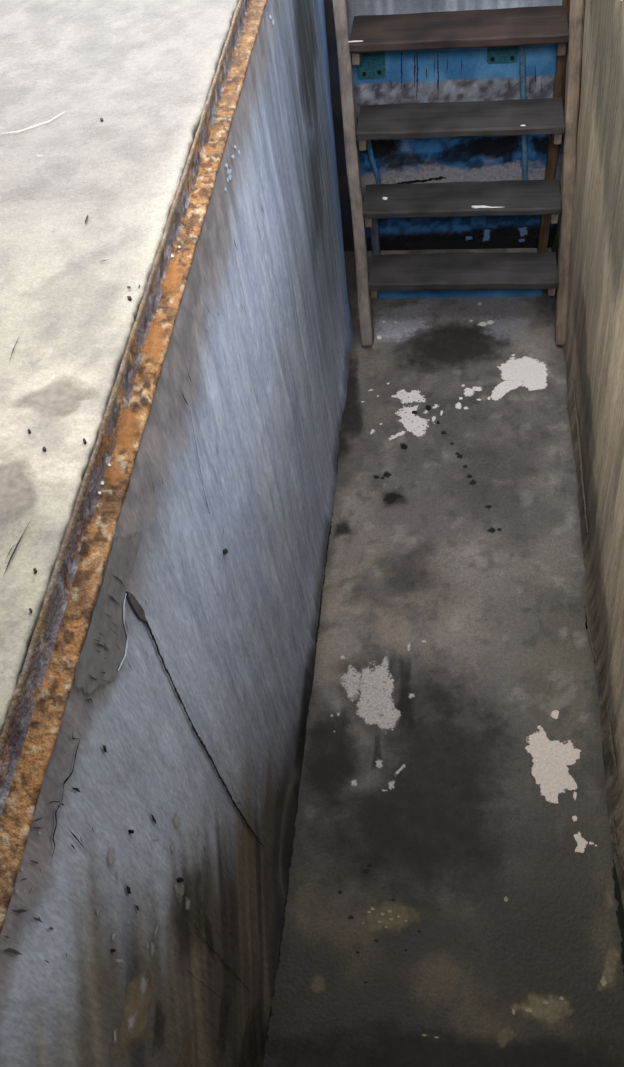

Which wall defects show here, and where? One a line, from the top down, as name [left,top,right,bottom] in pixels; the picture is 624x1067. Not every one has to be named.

corrosion [163,246,184,292]
corrosion [142,319,165,359]
water stain [375,304,499,368]
corrosion [117,372,156,449]
peeling [361,382,443,449]
peeling [455,354,548,409]
corrosion [98,462,122,494]
crack [315,505,334,655]
crack [125,591,264,847]
peeling [340,655,401,730]
peeling [525,725,581,804]
crack [262,708,309,1067]